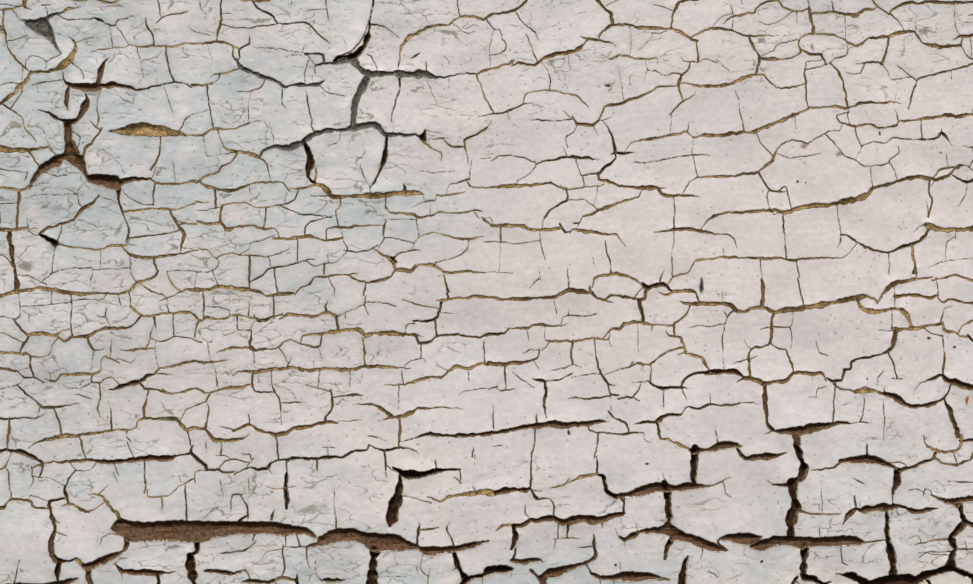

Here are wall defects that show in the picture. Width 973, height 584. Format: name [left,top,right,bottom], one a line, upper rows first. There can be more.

crack [397,0,539,68]
crack [0,0,93,141]
crack [62,57,162,111]
crack [0,137,57,166]
crack [482,217,625,260]
crack [636,392,758,438]
crack [411,378,651,550]
crack [736,448,787,461]
peeling [10,430,973,584]
crack [842,496,939,575]
crack [113,542,211,584]
crack [262,545,406,584]